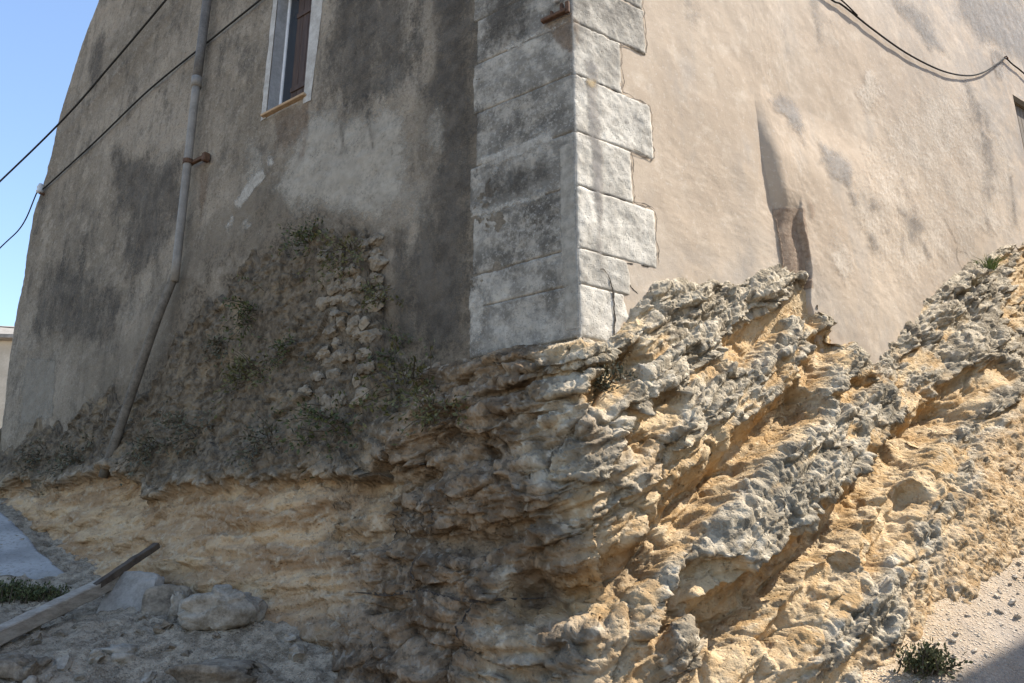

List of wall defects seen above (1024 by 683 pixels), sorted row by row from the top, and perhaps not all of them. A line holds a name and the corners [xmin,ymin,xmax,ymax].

damp [113,155,180,279]
damp [326,0,478,351]
flaking render [297,233,394,412]